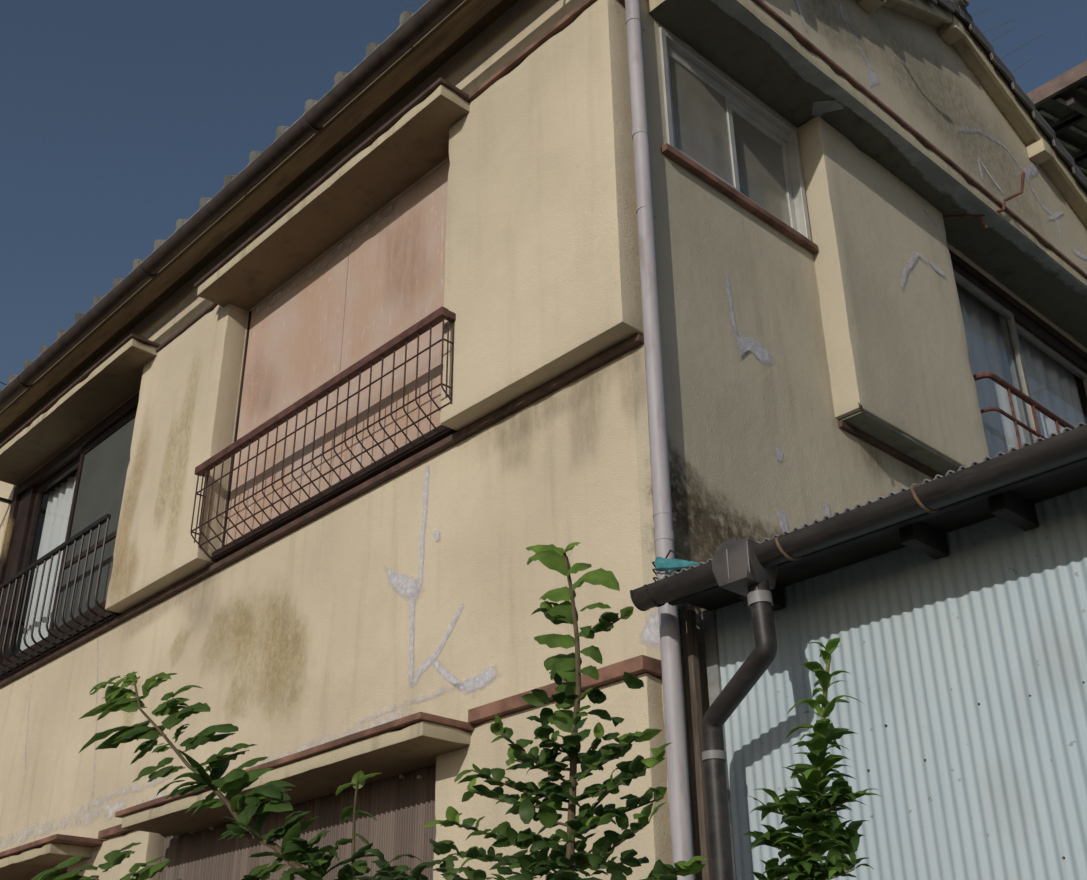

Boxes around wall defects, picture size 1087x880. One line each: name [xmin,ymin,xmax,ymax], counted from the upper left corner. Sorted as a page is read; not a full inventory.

crack [958,126,1087,260]
crack [726,275,771,362]
leakage [670,451,773,571]
crack [387,467,495,691]